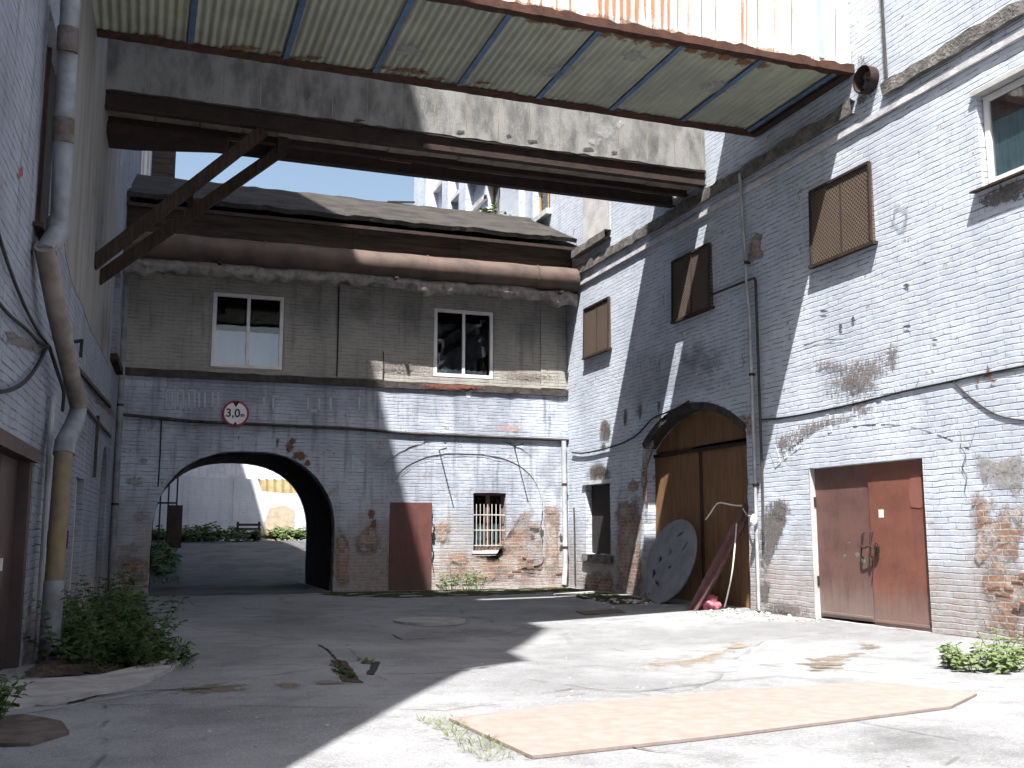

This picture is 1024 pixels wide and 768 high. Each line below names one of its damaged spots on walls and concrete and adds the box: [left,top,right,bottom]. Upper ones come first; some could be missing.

rust [512,0,793,70]
flaking render [447,506,563,583]
flaking render [583,440,654,596]
flaking render [970,452,1024,643]